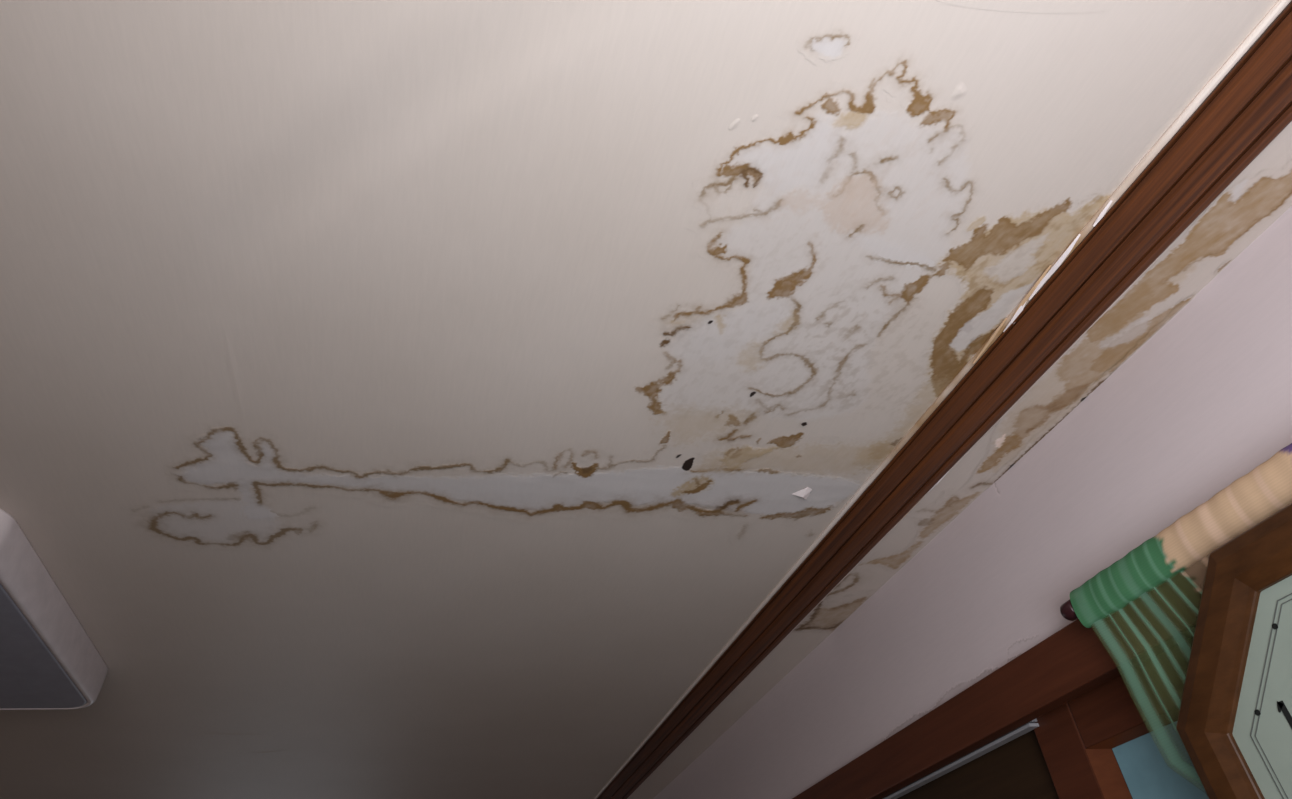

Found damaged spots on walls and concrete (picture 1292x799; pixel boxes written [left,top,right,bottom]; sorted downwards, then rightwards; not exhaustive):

leakage [797,21,861,65]
leakage [118,46,1120,553]
leakage [791,160,1292,634]